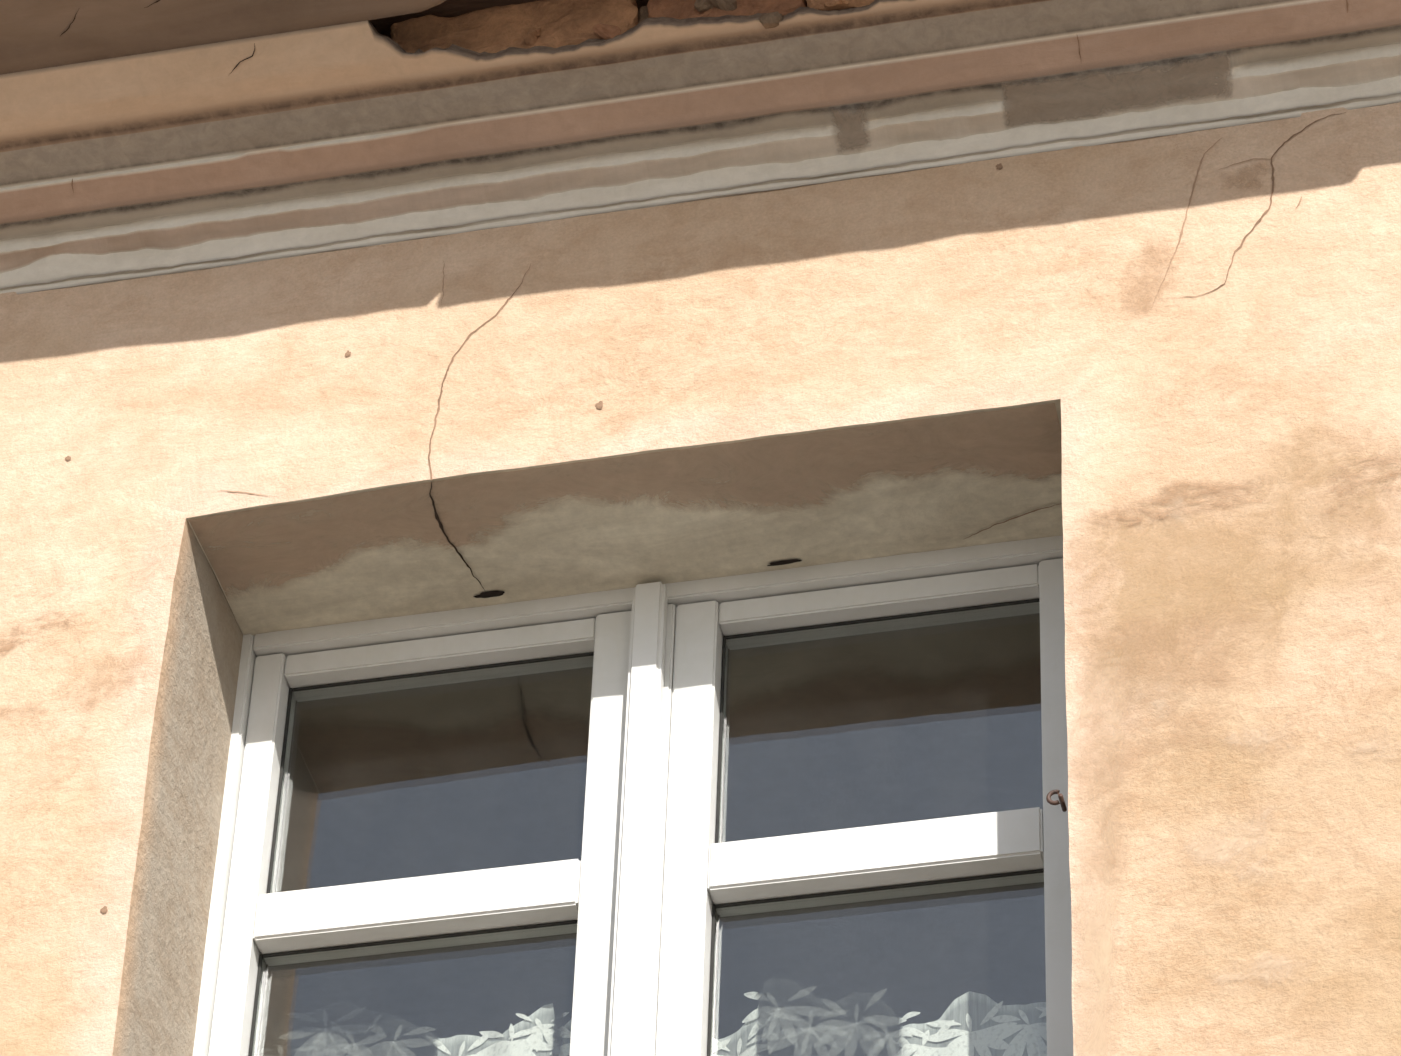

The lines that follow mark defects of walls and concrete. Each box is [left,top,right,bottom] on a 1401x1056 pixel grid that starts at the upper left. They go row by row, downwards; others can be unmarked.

flaking render [390,0,874,53]
crack [1152,112,1345,306]
crack [428,264,531,589]